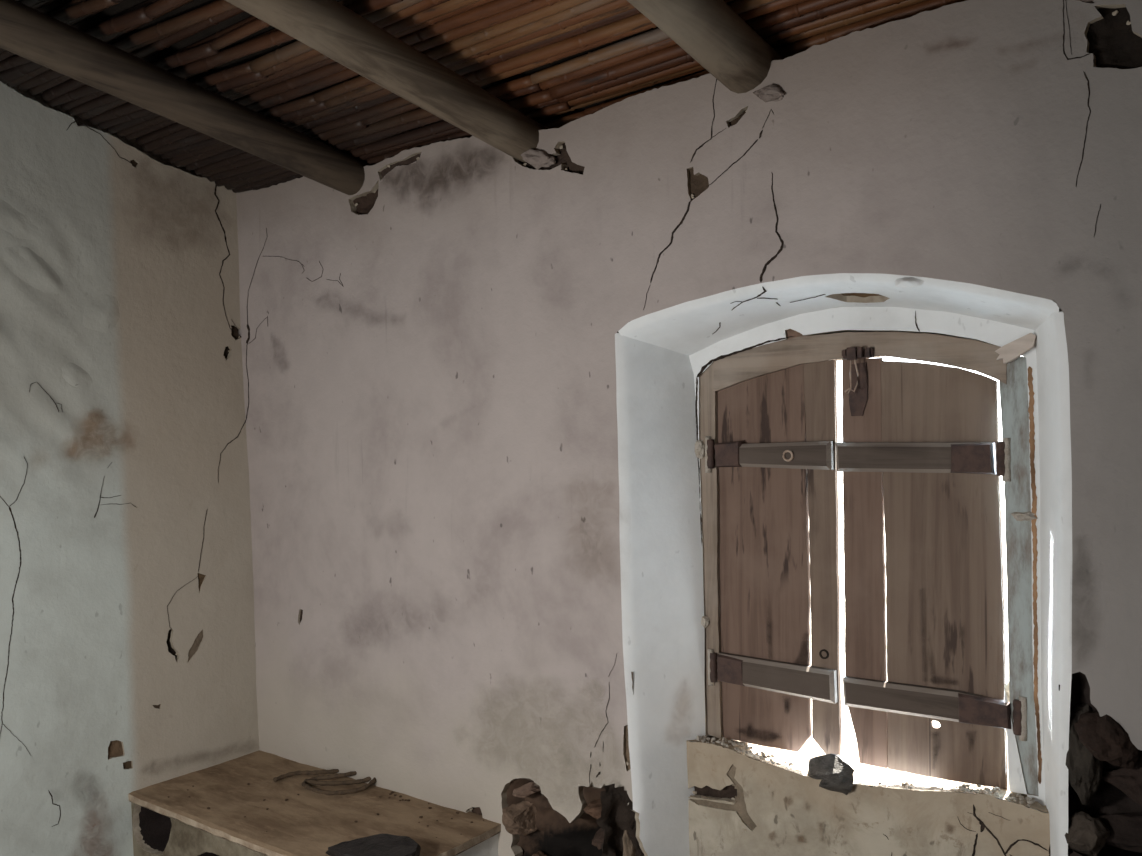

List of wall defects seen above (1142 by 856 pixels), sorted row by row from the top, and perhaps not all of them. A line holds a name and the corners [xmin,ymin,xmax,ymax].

crack [690,79,726,163]
crack [643,109,774,310]
crack [1063,0,1094,186]
spalling [1087,7,1142,69]
crack [214,185,343,468]
crack [0,457,30,754]
crack [167,511,207,626]
flaking render [502,778,644,856]
crack [957,804,1051,856]
flaking render [1059,672,1142,856]